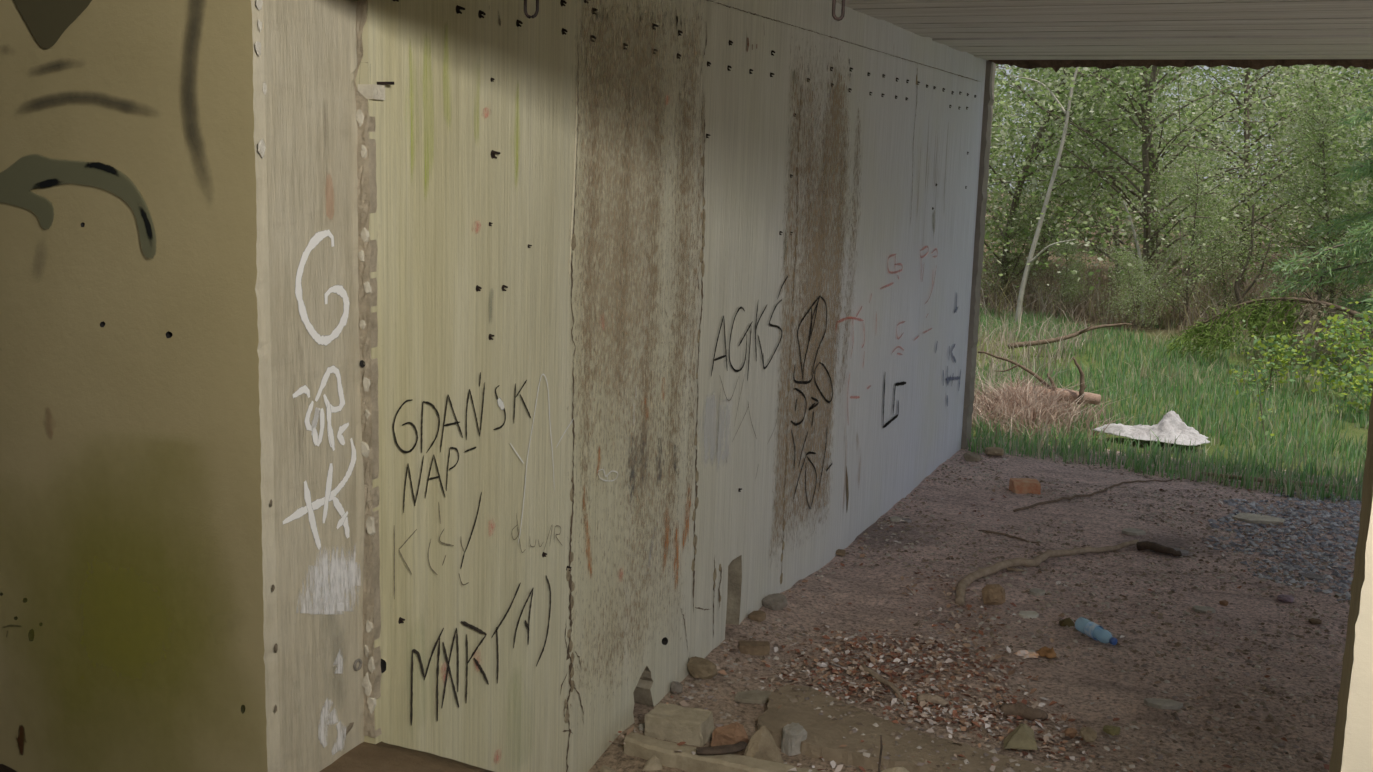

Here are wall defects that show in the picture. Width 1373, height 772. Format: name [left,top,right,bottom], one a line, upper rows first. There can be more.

crack [560,35,584,772]
water stain [581,85,719,536]